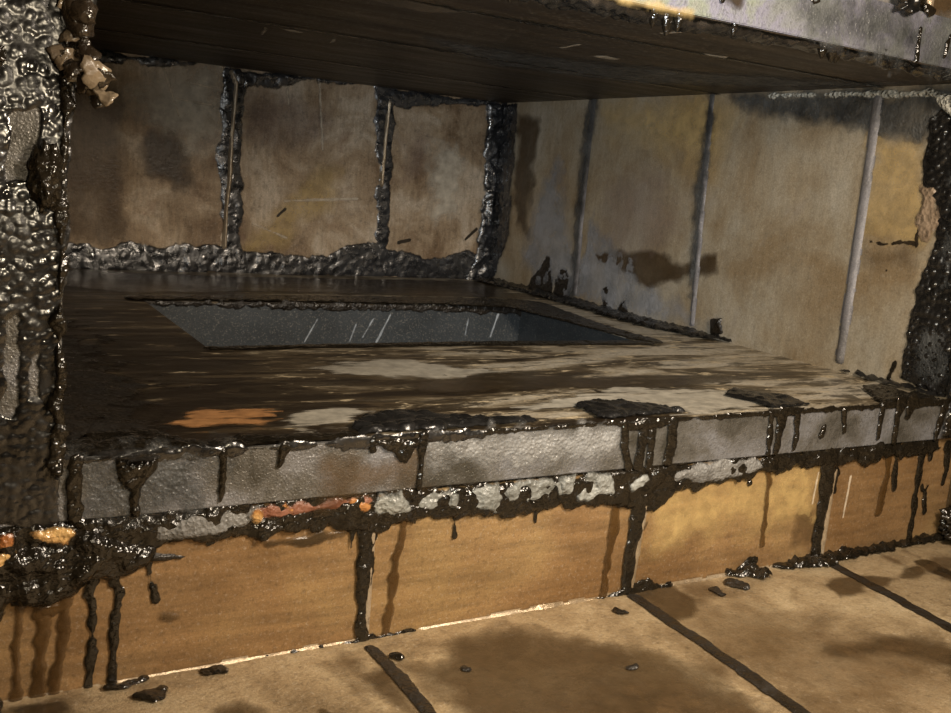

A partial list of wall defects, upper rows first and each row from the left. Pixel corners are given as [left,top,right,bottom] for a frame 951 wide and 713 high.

peeling [46,0,119,109]
leakage [526,99,665,315]
rust [252,497,372,523]
leakage [145,561,161,604]
leakage [9,577,126,702]